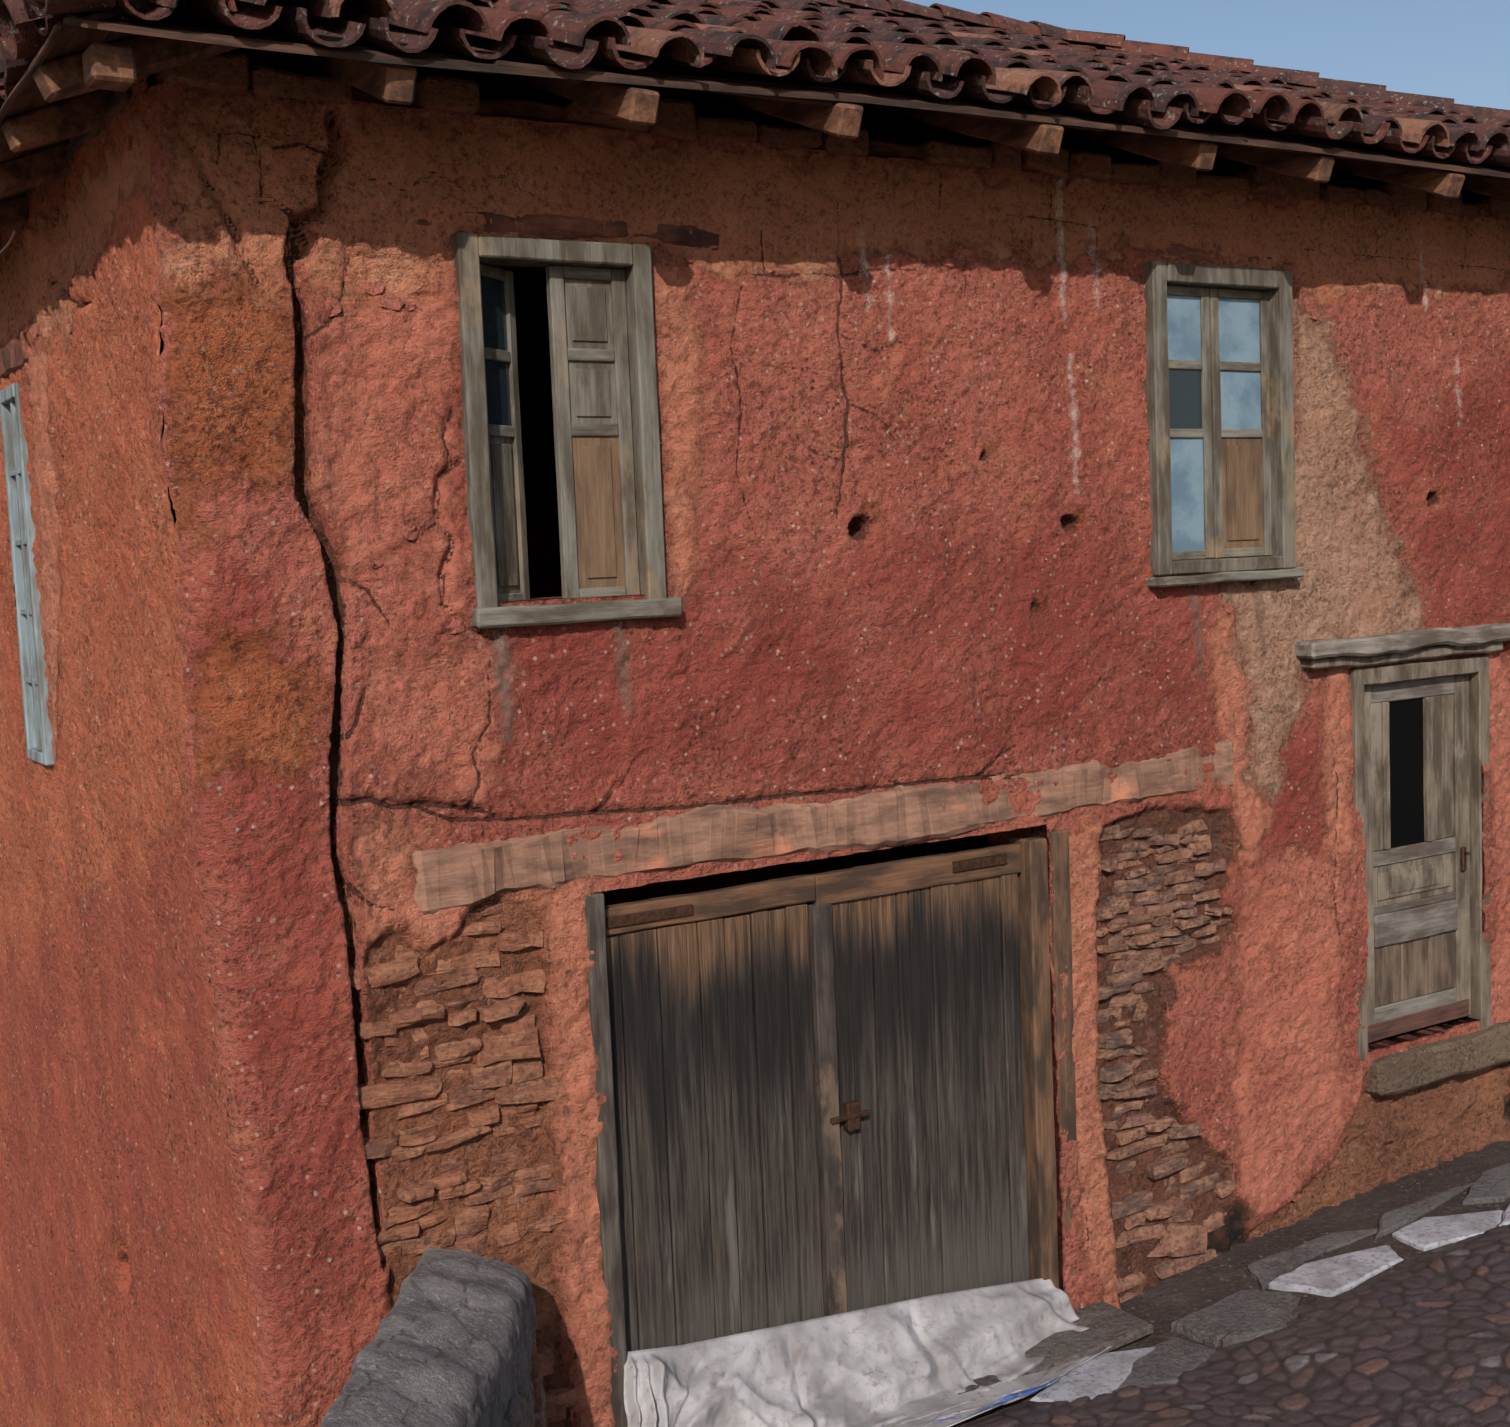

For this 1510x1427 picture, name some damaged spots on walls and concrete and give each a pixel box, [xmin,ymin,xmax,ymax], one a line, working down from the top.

spalling [349,889,578,1427]
crack [190,111,1024,1264]
flaking render [0,87,1510,803]
crack [1007,194,1105,246]
spalling [1095,603,1510,1305]
crack [1304,233,1509,297]